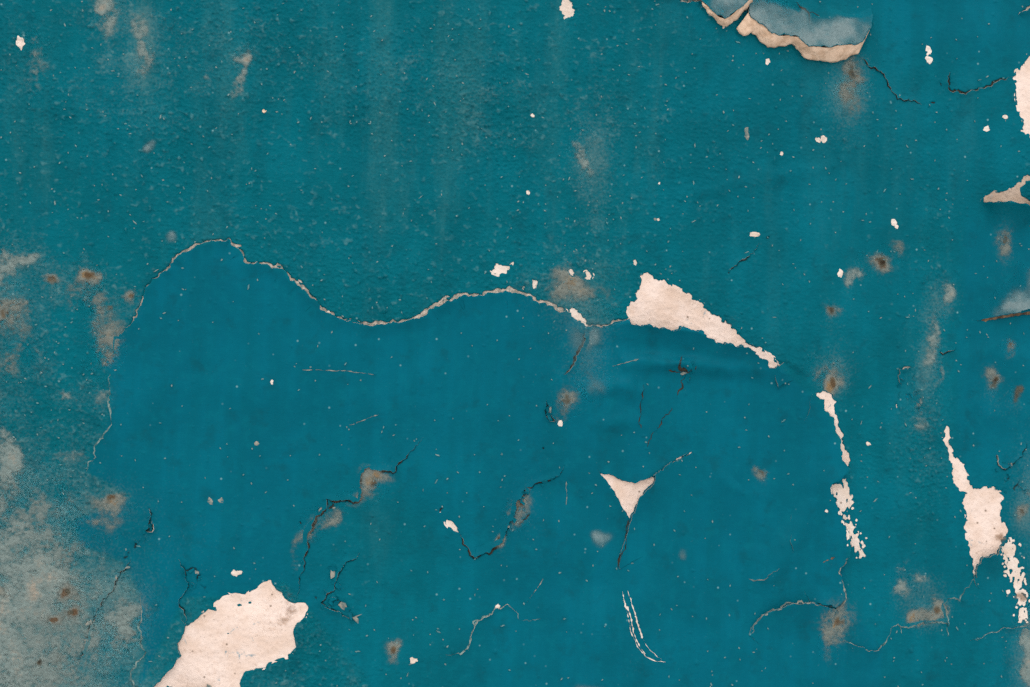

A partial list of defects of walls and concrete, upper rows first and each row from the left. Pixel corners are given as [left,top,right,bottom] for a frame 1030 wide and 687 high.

crack [649,0,703,10]
spalling [702,0,870,65]
peeling [1002,56,1030,135]
crack [86,238,631,472]
peeling [626,260,780,368]
crack [291,438,423,623]
crack [461,401,564,559]
peeling [601,474,654,518]
peeling [816,391,850,466]
peeling [943,426,1008,577]
peeling [155,580,308,687]
crack [749,558,848,632]